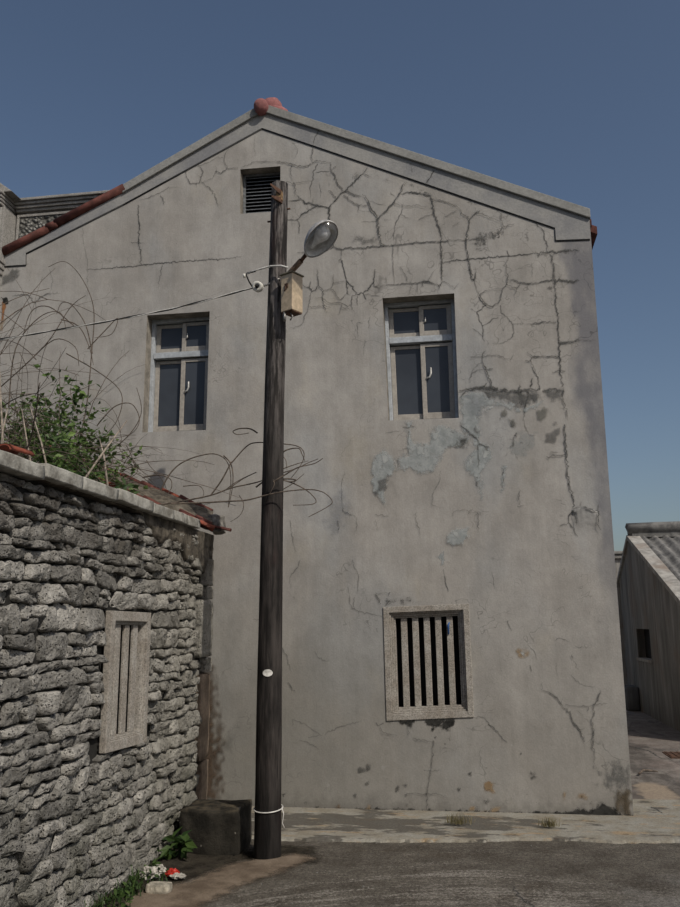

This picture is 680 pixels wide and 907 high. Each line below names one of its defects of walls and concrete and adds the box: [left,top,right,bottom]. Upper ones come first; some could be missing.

crack [88,193,235,270]
crack [185,132,579,507]
peeling [460,393,540,494]
crack [543,690,601,752]